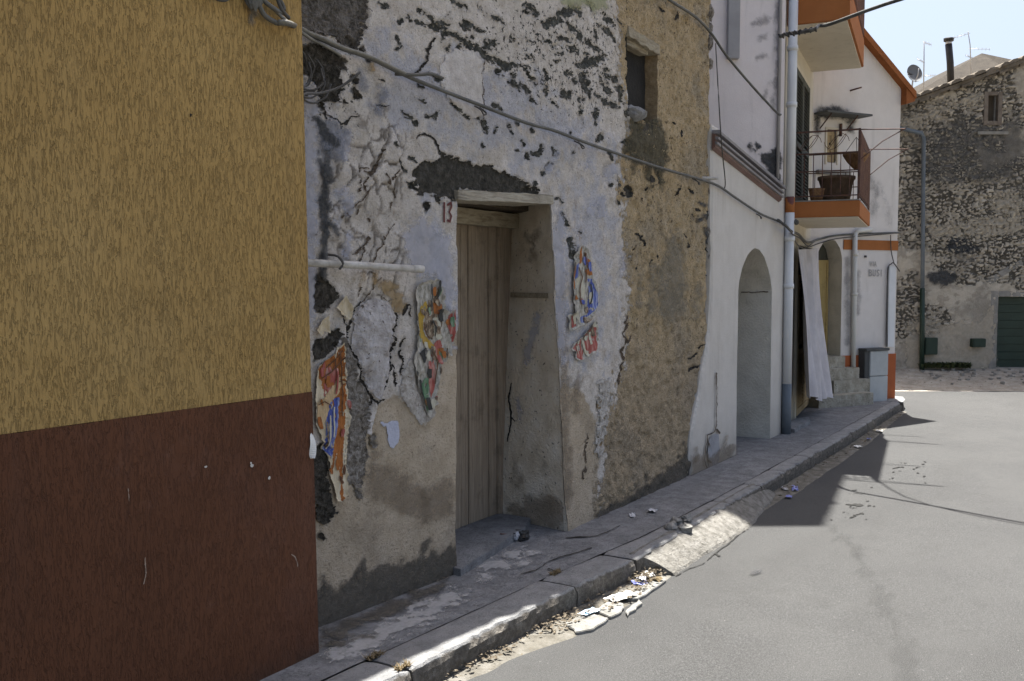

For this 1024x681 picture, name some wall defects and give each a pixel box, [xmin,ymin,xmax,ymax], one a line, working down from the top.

flaking render [397,0,630,161]
flaking render [406,128,576,212]
water stain [623,141,665,188]
flaking render [313,273,339,313]
crack [341,149,412,404]
flaking render [313,328,386,501]
crack [507,383,515,442]
flaking render [314,443,339,541]
water stain [317,539,457,647]